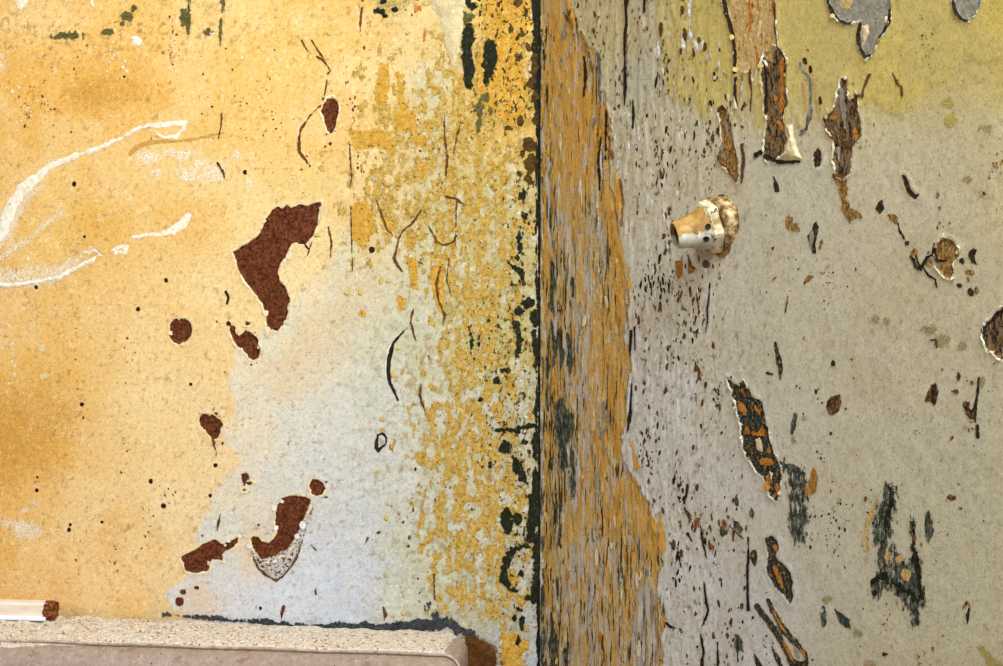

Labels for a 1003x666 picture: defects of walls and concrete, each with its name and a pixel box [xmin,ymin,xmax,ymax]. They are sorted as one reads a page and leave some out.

leakage [13,0,33,11]
leakage [43,31,85,40]
leakage [101,0,229,46]
leakage [371,0,422,20]
peeling [951,0,982,23]
leakage [64,36,161,124]
peeling [216,0,892,666]
leakage [0,344,92,541]
flaking render [175,478,328,606]